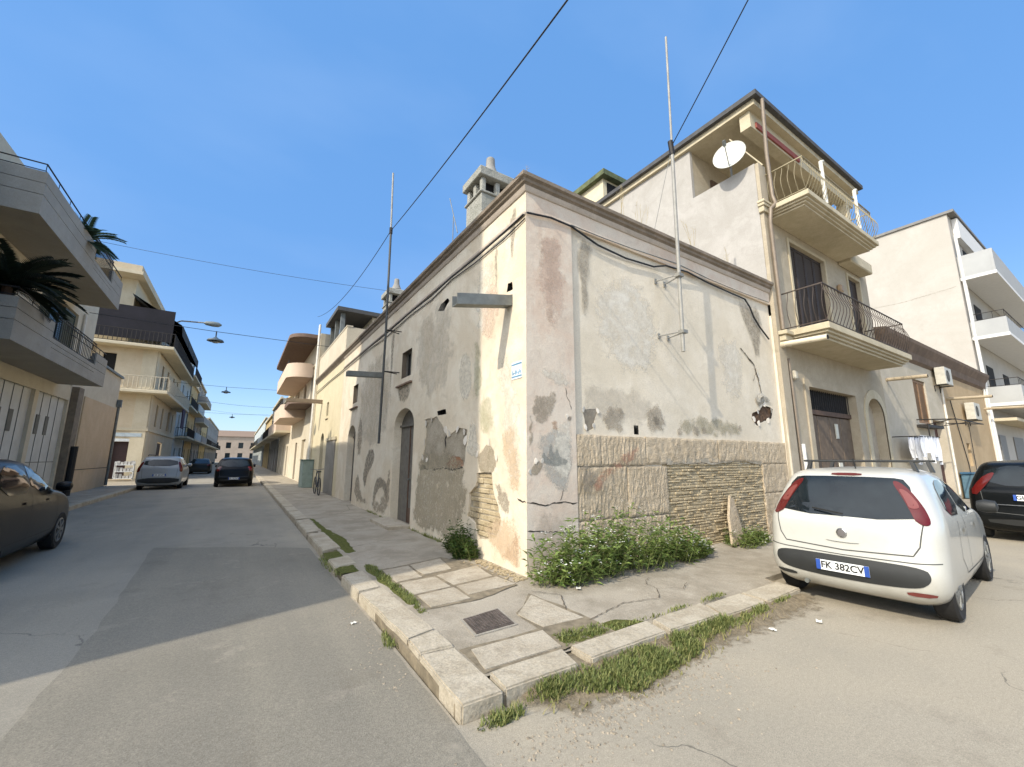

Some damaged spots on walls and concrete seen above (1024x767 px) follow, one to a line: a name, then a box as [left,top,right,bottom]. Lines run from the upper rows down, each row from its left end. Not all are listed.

spalling [752,402,772,426]
spalling [422,354,599,565]
crack [517,488,578,506]